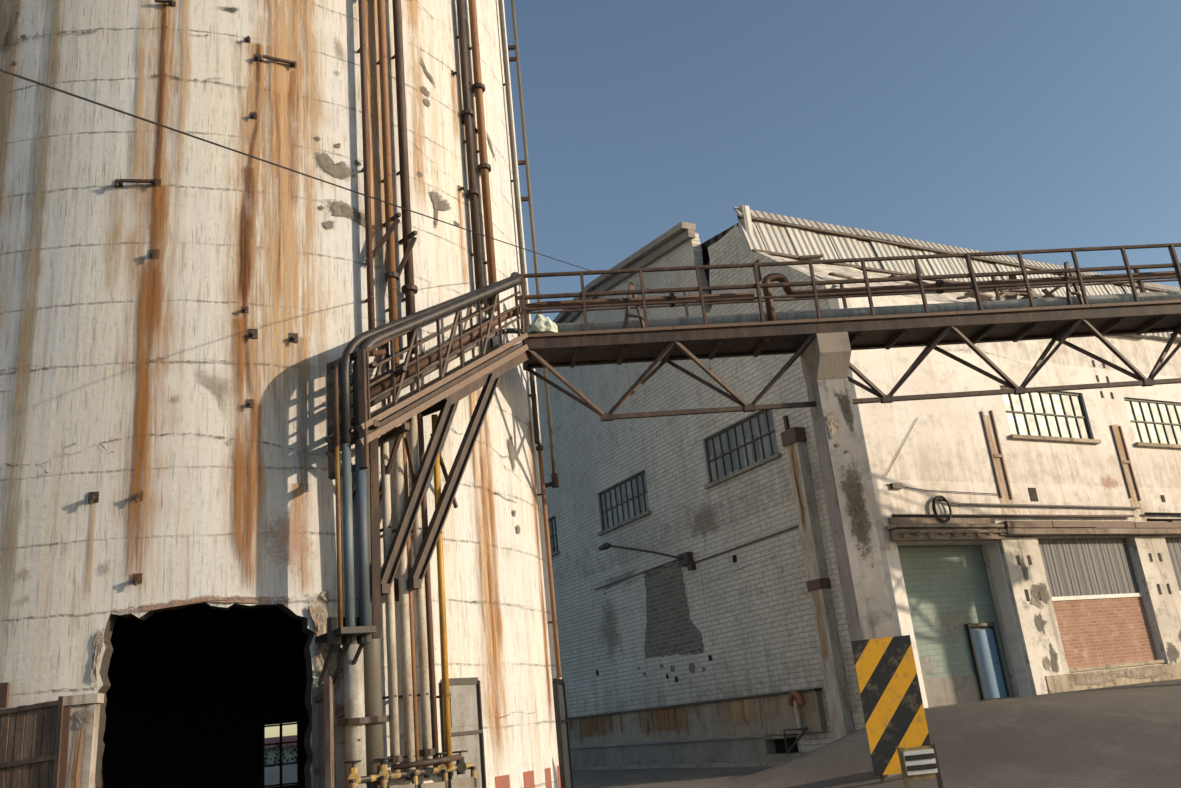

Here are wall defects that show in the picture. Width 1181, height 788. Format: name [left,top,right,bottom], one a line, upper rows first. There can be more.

rust [0,0,60,578]
rust [112,0,188,570]
rust [232,0,319,589]
spalling [314,136,361,180]
spalling [319,199,365,229]
rust [471,388,507,739]
peeling [605,561,705,676]